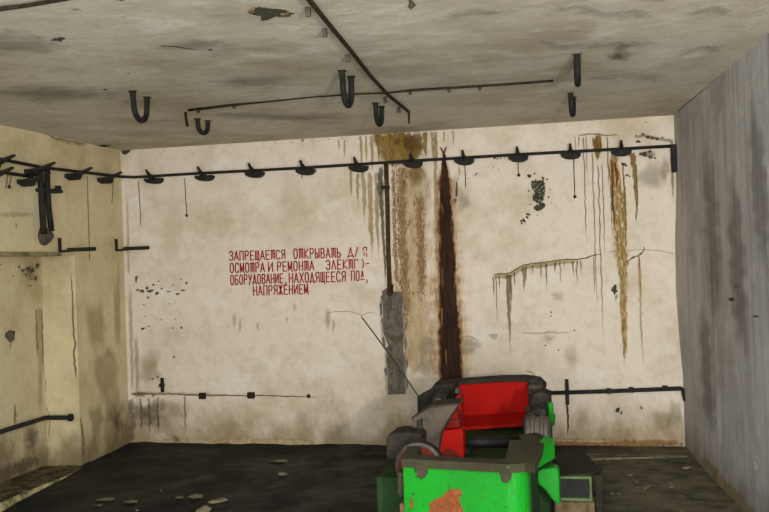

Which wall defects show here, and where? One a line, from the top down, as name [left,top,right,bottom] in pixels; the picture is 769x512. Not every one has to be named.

spalling [247,7,294,21]
leakage [374,132,433,370]
rust [437,147,462,380]
leakage [520,173,550,224]
rust [610,153,638,355]